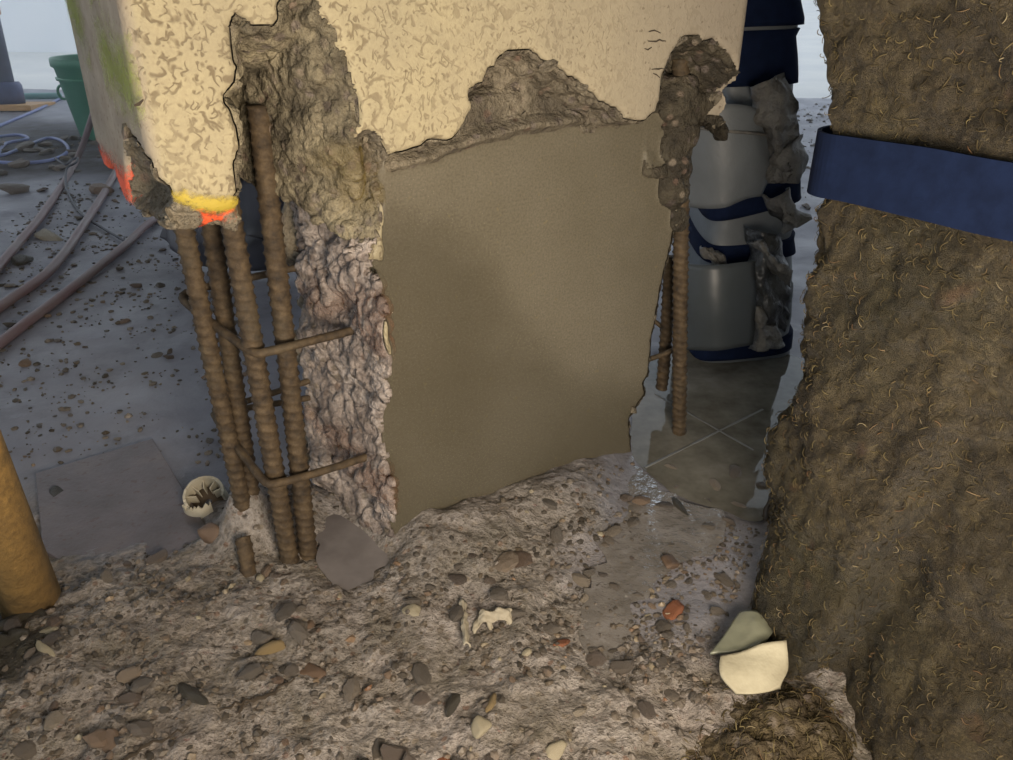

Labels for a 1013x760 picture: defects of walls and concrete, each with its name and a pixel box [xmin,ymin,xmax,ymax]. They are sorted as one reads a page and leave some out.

spalling [121,0,741,538]